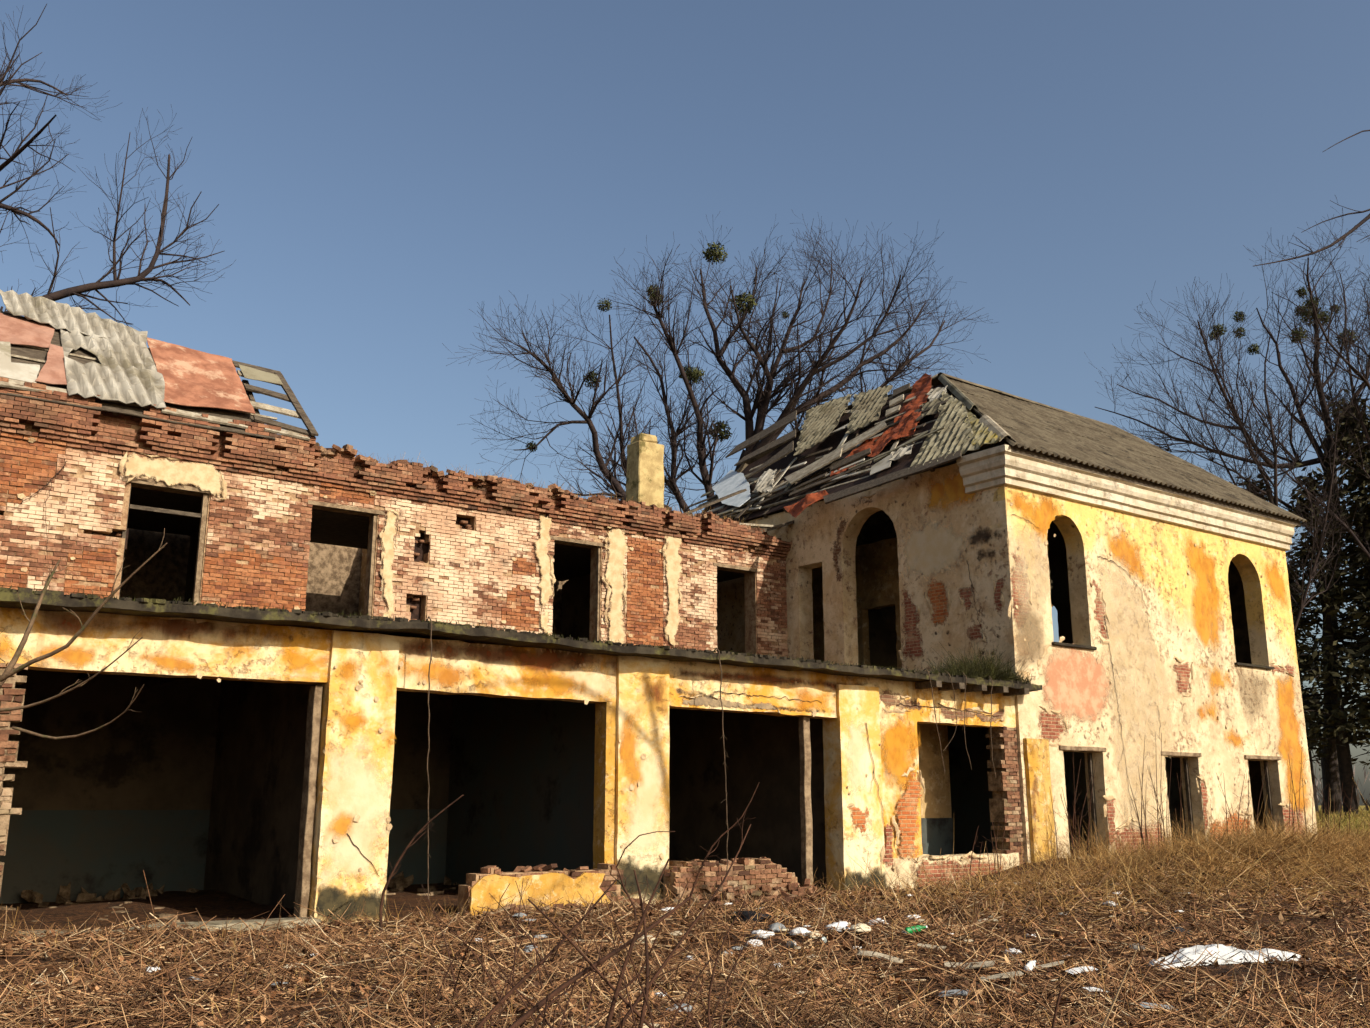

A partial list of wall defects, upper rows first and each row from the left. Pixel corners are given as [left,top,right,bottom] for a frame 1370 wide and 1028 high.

peeling [119,451,183,483]
damp [53,615,278,638]
flaking render [898,579,986,663]
flaking render [1037,577,1111,747]
flaking render [1174,657,1246,746]
flaking render [848,689,1008,889]